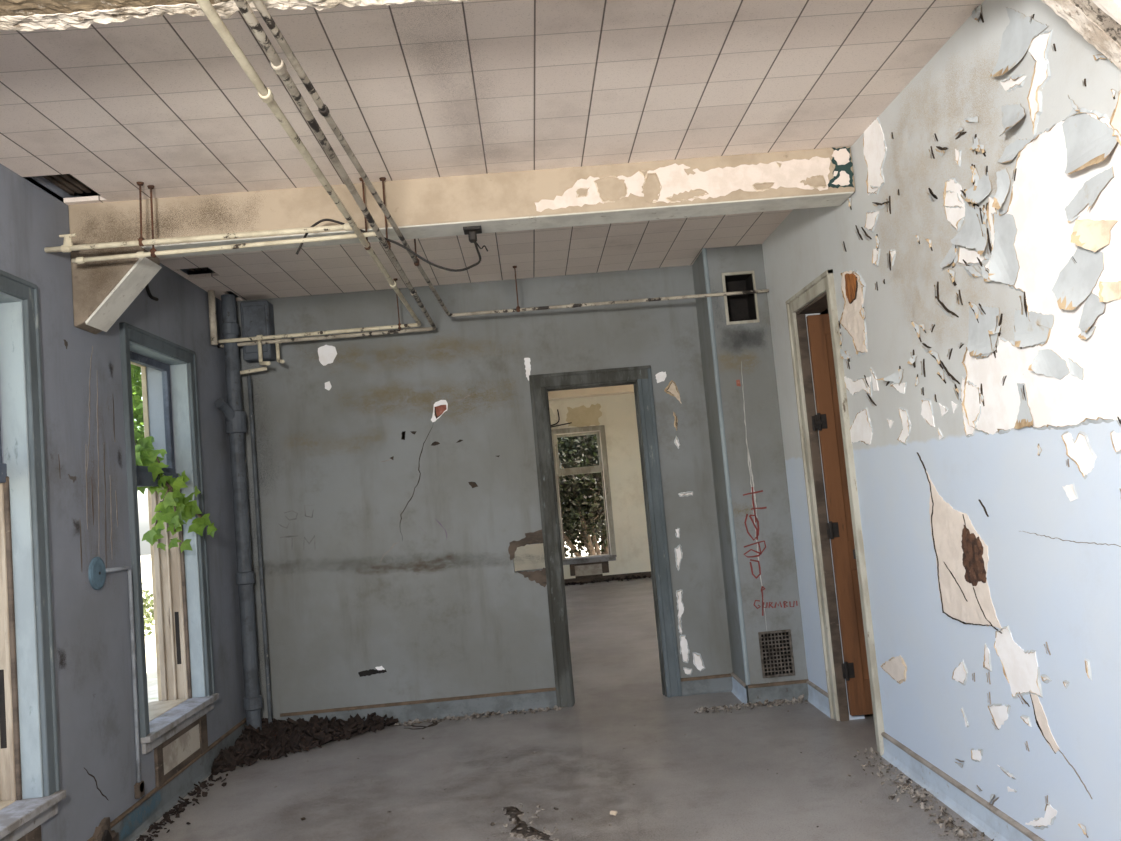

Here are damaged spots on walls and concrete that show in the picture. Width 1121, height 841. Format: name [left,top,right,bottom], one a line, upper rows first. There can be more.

spalling [0,0,469,31]
spalling [1070,0,1121,46]
peeling [535,5,1121,730]
spalling [431,400,448,422]
crack [1023,531,1121,547]
spalling [508,529,547,587]
peeling [955,748,983,768]
crack [1023,690,1092,799]
peeling [1025,795,1057,830]